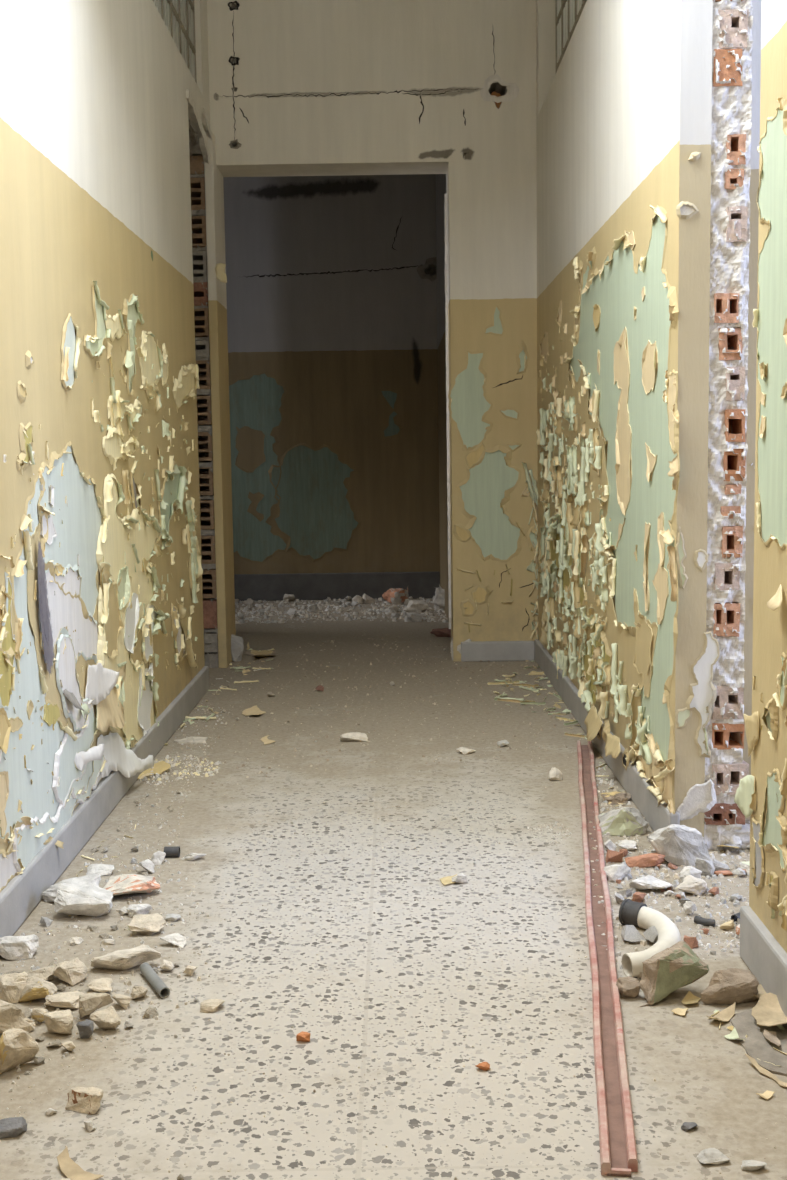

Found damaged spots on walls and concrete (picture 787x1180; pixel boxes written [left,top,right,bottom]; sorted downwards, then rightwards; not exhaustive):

crack [220,11,496,140]
crack [239,217,422,278]
peeling [0,89,227,892]
peeling [229,372,362,563]
peeling [417,0,787,931]